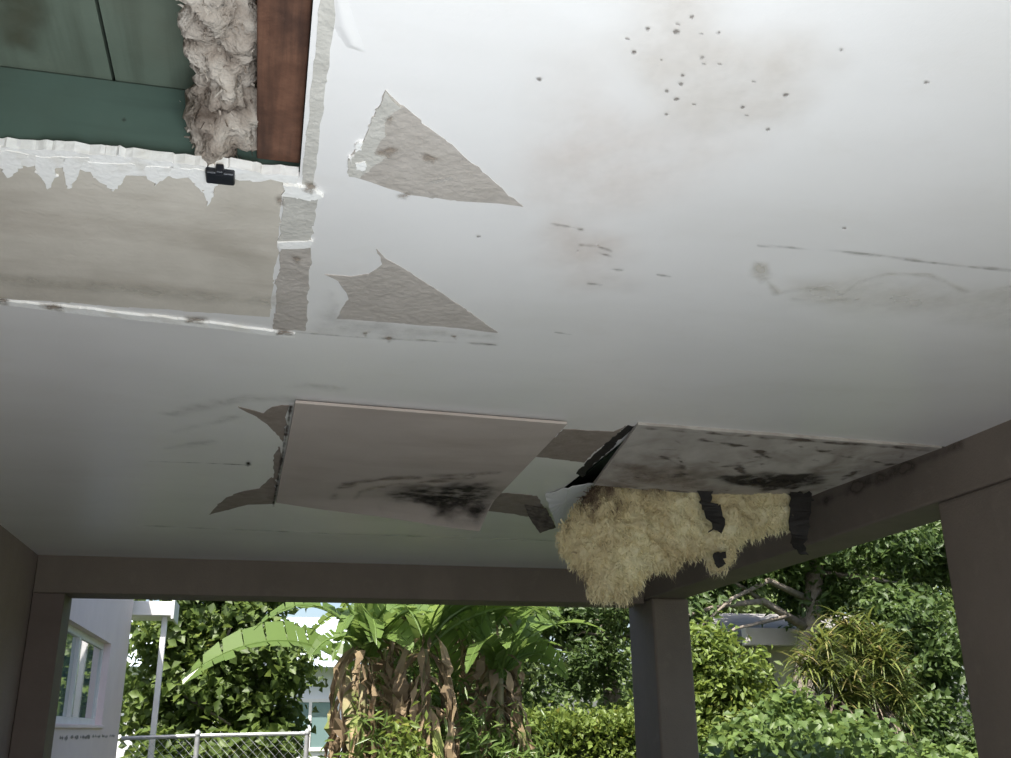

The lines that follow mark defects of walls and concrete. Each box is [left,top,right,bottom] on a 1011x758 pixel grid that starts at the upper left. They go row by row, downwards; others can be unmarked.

flaking render [347,90,523,207]
peeling [0,166,289,317]
peeling [325,249,498,337]
damp [392,484,488,514]
damp [723,465,821,491]
damp [792,439,859,452]